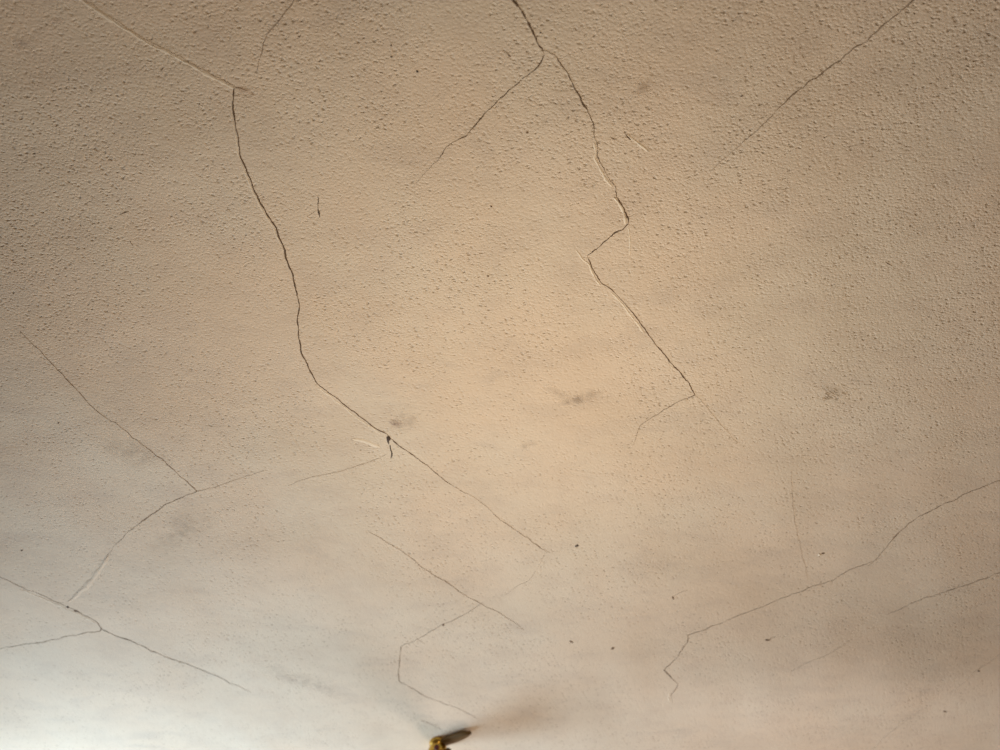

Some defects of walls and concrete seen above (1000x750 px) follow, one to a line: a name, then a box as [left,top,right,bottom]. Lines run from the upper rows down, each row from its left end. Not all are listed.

crack [0,337,265,692]
crack [79,0,548,728]
crack [417,0,734,443]
crack [710,0,914,172]
crack [664,473,996,702]